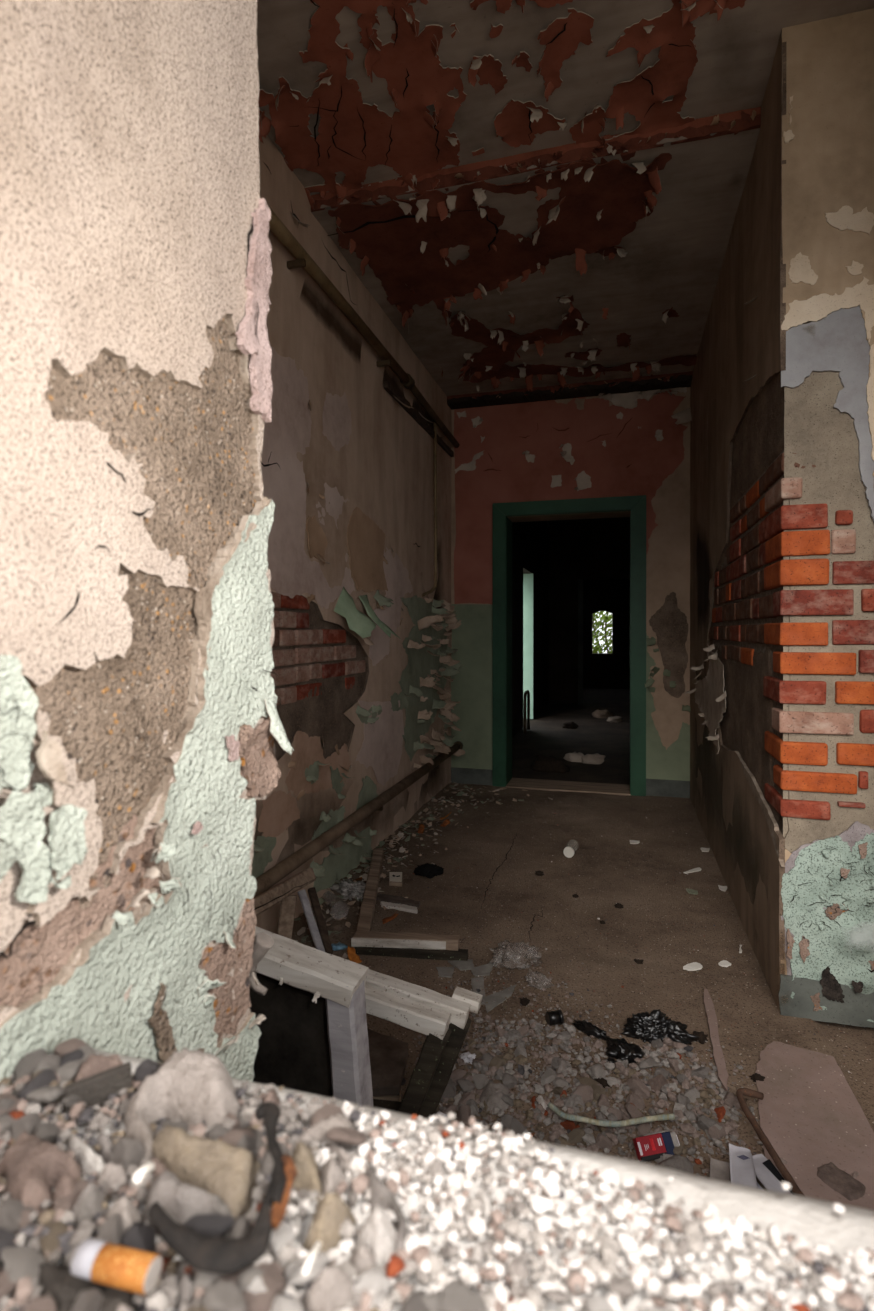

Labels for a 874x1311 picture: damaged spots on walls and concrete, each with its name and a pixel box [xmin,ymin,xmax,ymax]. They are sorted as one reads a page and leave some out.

peeling [0,198,465,1085]
peeling [258,0,746,441]
peeling [551,443,592,491]
flaking render [645,371,874,1011]